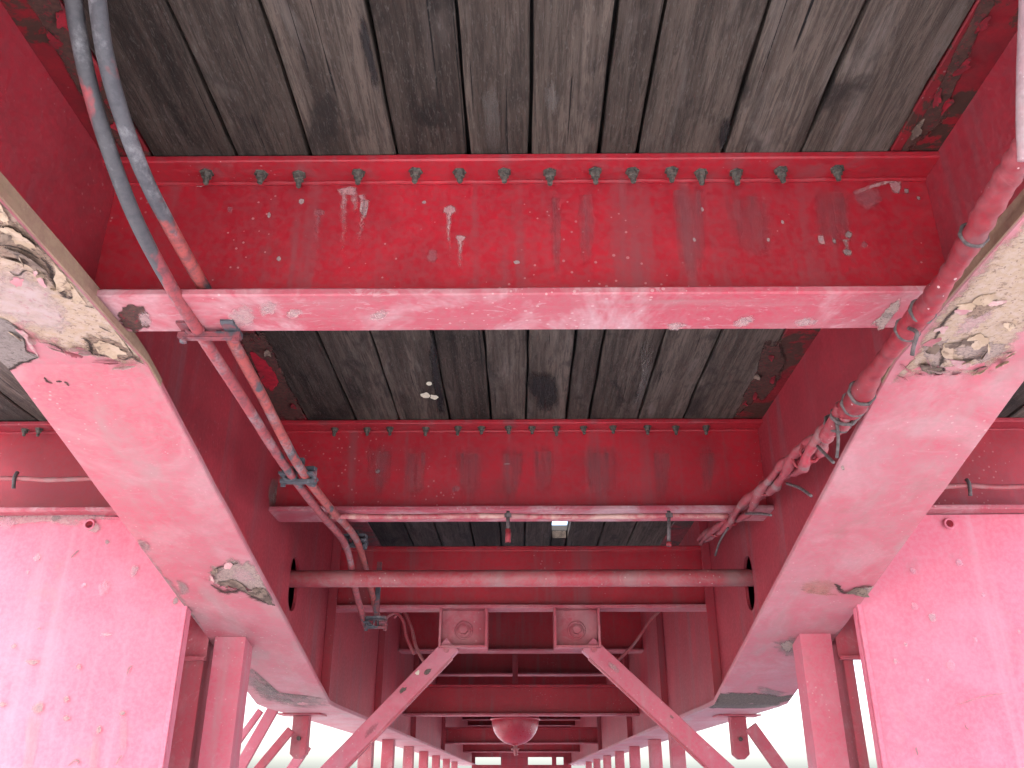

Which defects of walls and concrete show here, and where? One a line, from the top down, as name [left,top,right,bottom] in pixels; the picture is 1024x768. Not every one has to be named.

peeling [933,87,954,116]
peeling [911,118,925,140]
leakage [341,190,368,221]
peeling [0,202,145,371]
peeling [897,224,1024,381]